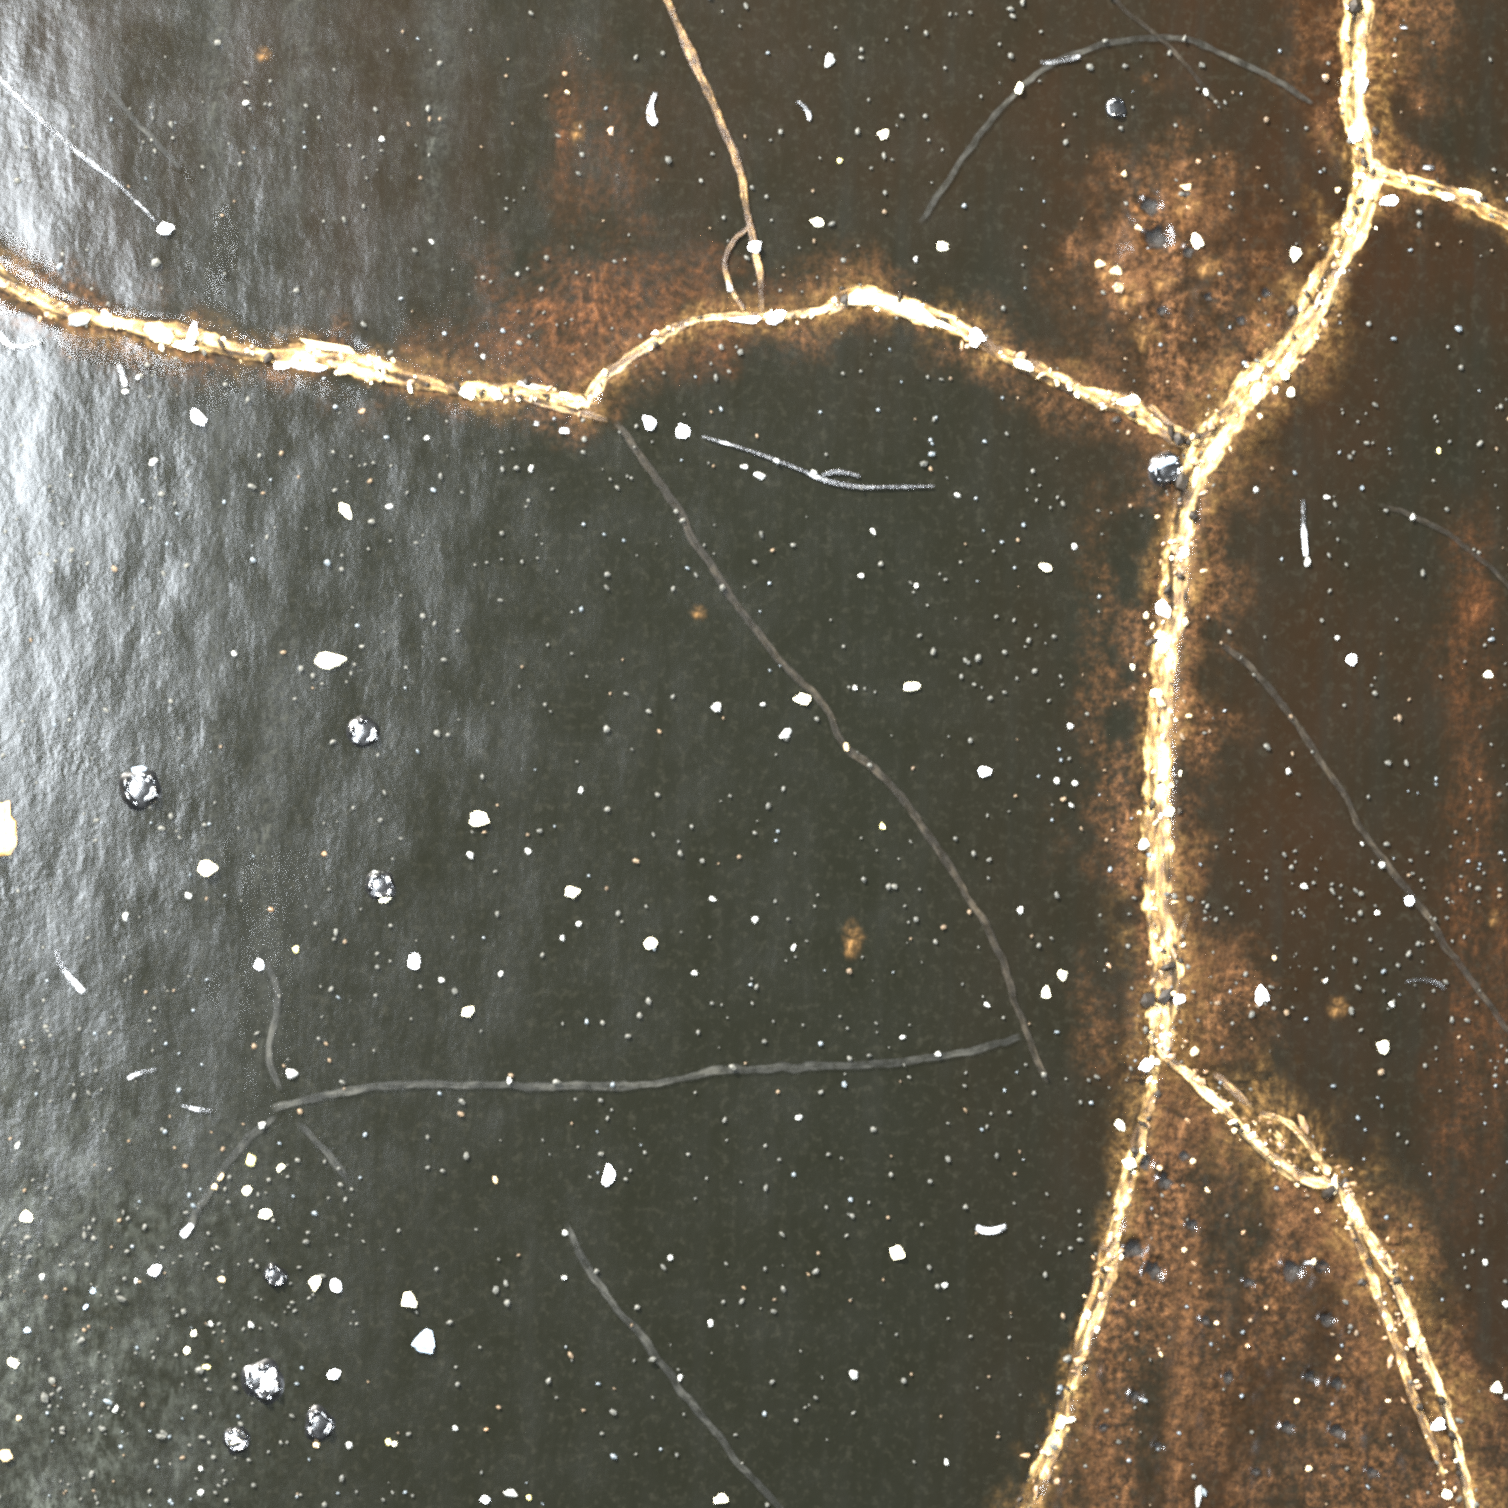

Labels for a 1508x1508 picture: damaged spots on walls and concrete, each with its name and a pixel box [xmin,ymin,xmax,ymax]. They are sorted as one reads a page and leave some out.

crack [0,0,973,421]
crack [977,0,1508,1508]